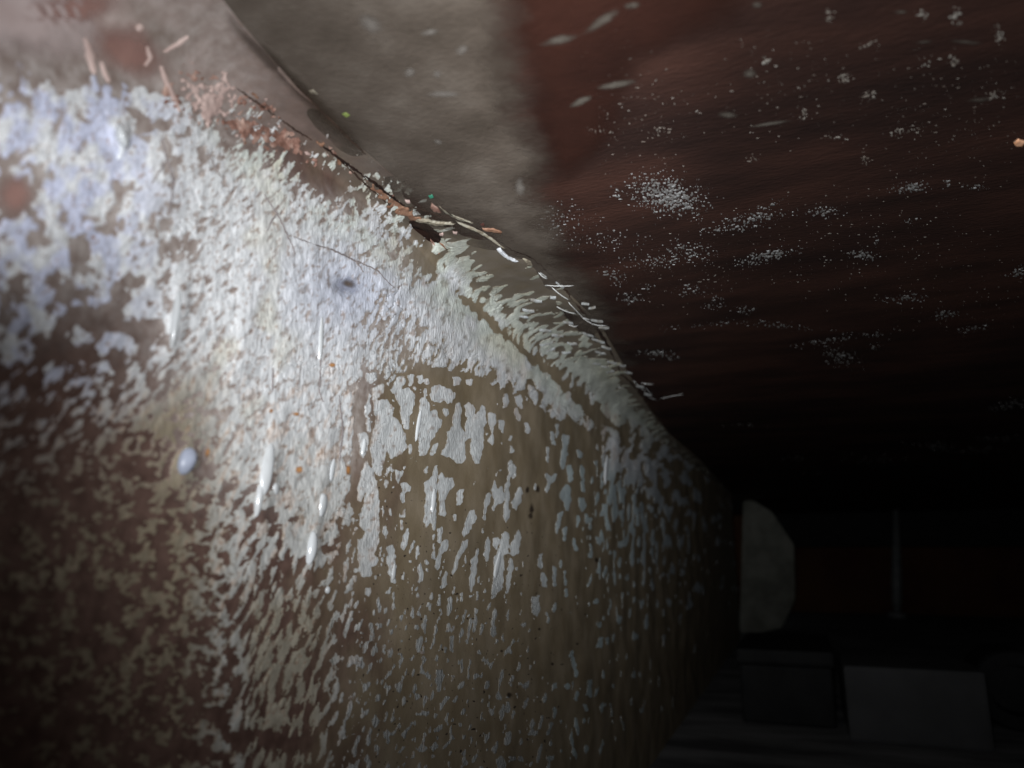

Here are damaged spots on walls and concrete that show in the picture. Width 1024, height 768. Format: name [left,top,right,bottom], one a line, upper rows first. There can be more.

crack [264,194,394,288]
crack [237,38,439,216]
leakage [224,0,804,343]
peeling [794,59,855,124]
leakage [847,239,881,261]
leakage [886,180,928,194]
peeling [885,48,1012,162]
crack [465,222,668,432]
peeling [154,62,738,768]